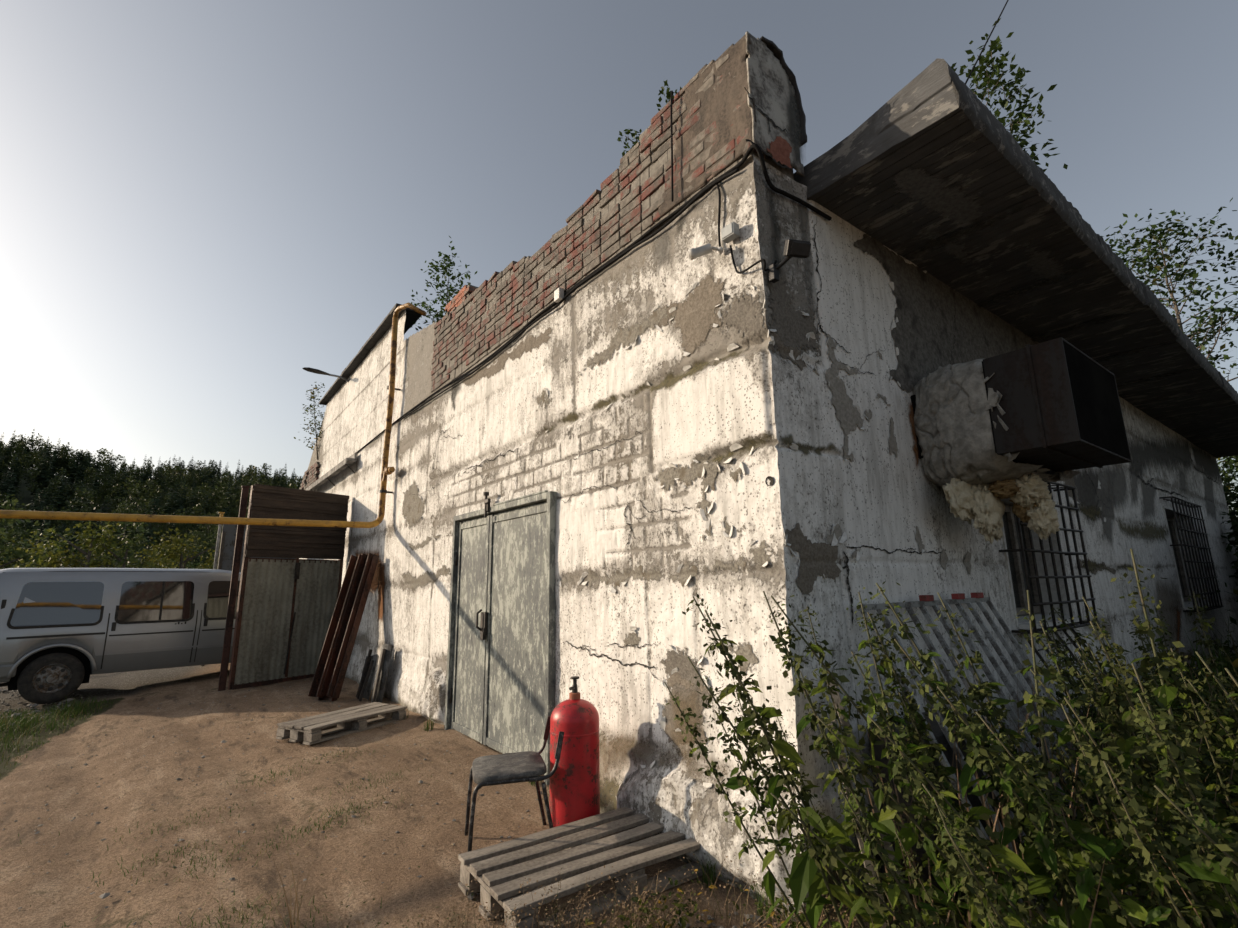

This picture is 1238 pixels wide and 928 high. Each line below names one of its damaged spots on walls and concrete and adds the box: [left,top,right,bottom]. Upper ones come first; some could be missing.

crack [813,219,886,376]
peeling [849,234,1039,392]
spalling [577,275,899,462]
peeling [402,480,427,527]
peeling [407,530,452,551]
spalling [783,522,862,595]
crack [830,544,952,629]
crack [564,641,658,680]
flaking render [659,644,713,747]